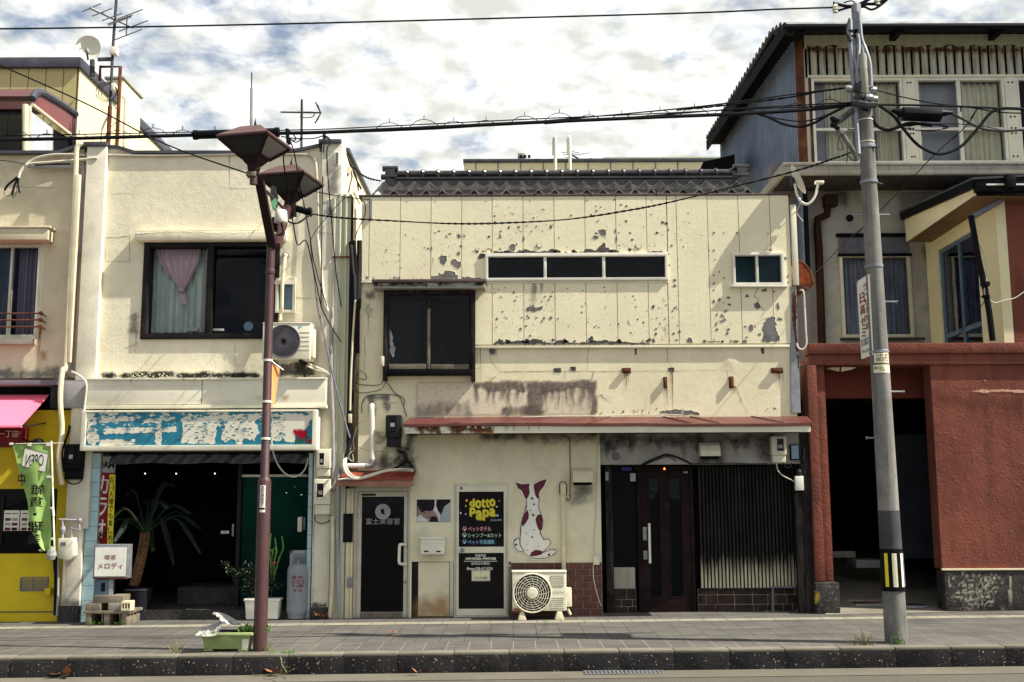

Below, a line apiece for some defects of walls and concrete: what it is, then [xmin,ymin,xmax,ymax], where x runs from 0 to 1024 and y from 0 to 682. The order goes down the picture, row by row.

peeling [366,199,690,287]
peeling [489,249,783,355]
damp [475,380,597,415]
corrosion [416,422,508,434]
damp [482,434,722,463]
damp [725,433,772,457]